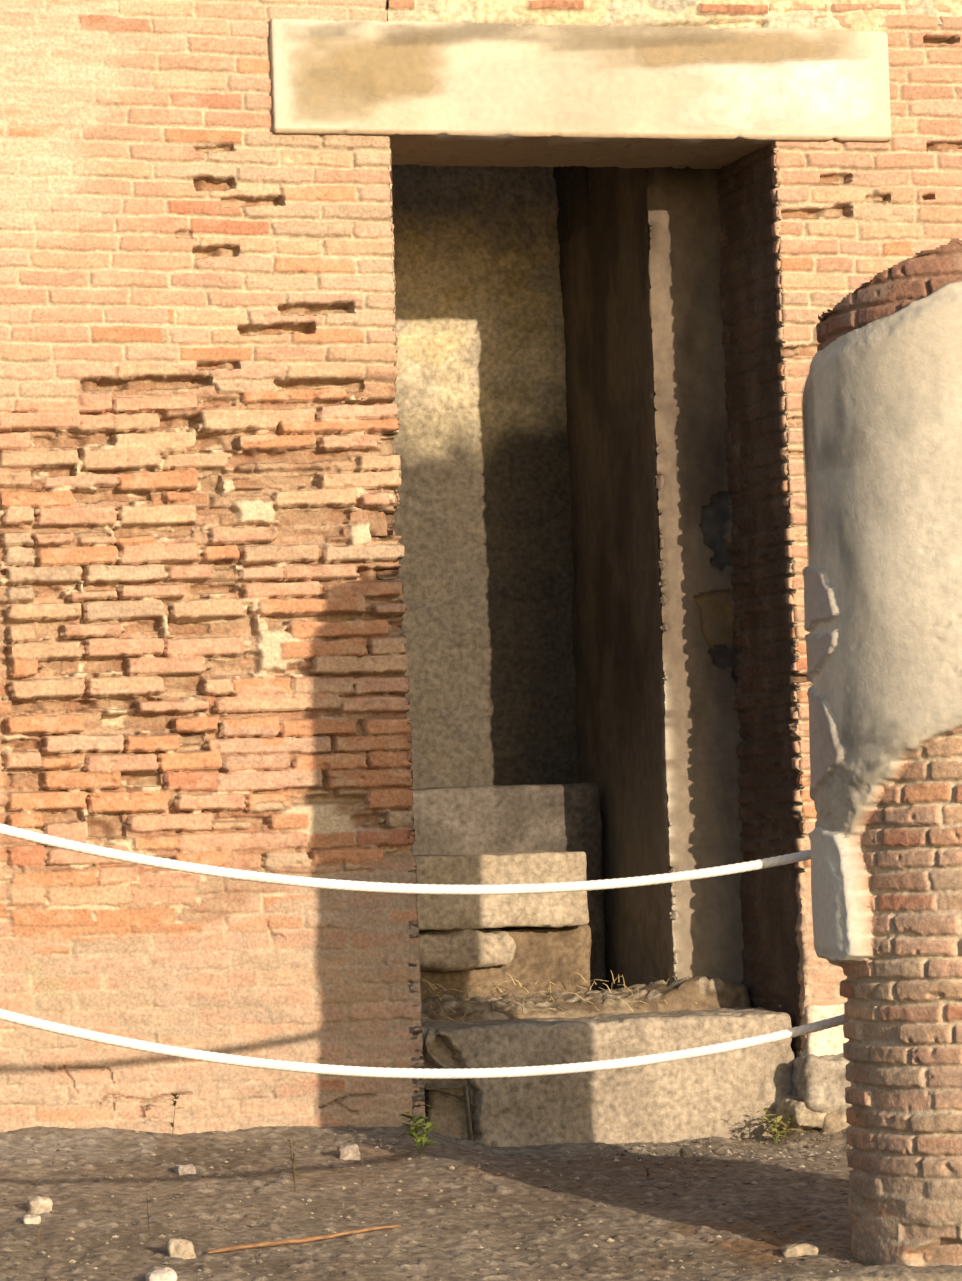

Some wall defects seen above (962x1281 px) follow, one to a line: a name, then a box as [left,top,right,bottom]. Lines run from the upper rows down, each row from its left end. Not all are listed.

spalling [193,145,237,153]
spalling [194,176,286,208]
spalling [175,230,240,260]
spalling [238,303,356,336]
spalling [904,456,962,717]
spalling [0,362,417,878]